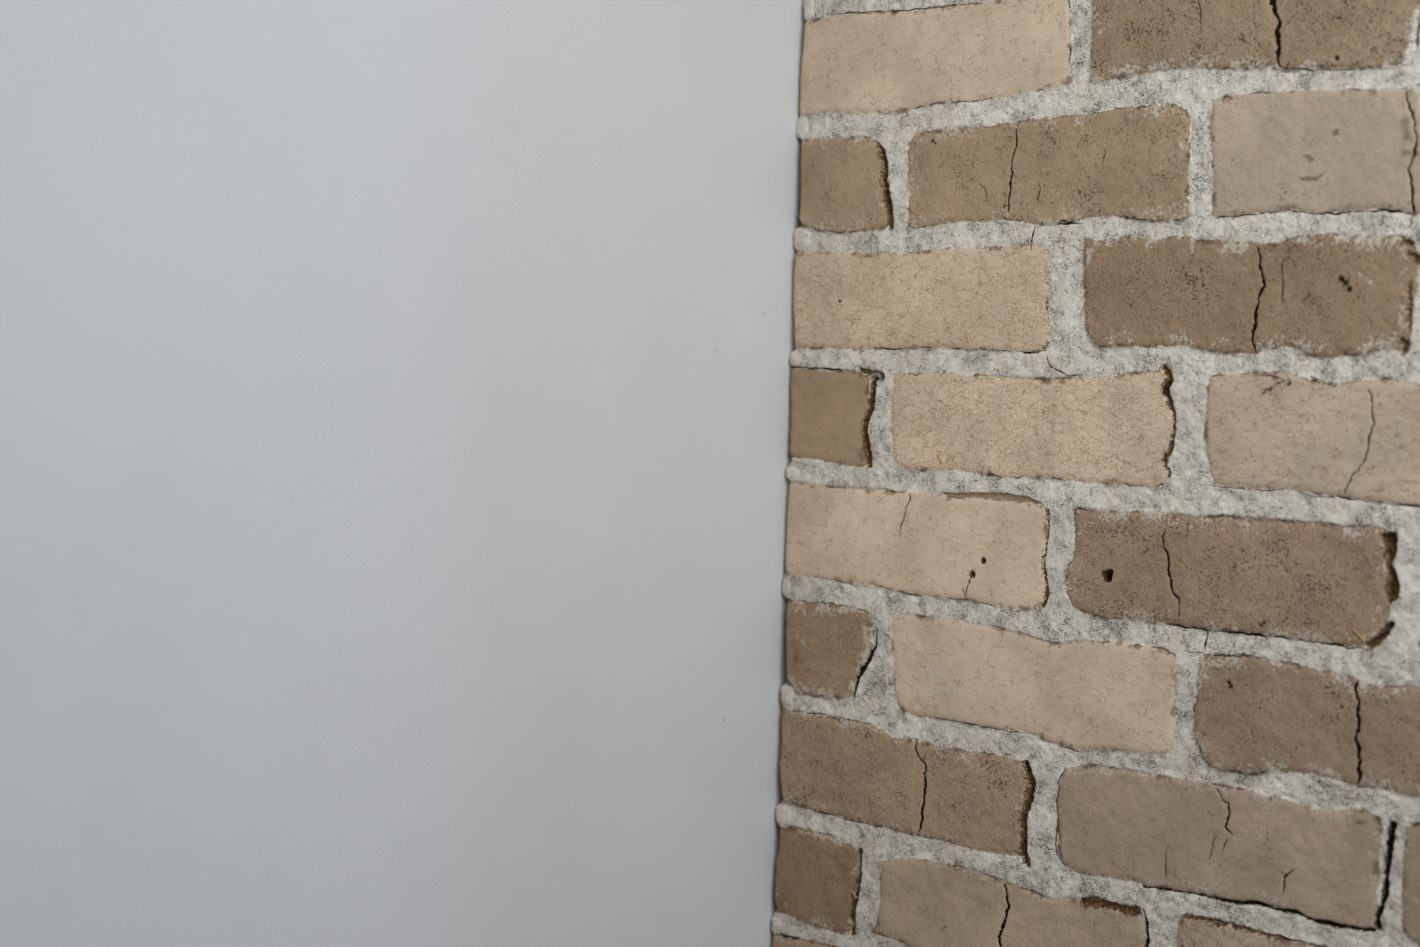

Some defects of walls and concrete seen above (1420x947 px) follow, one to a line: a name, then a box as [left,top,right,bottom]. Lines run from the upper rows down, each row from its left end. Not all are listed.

crack [980,129,1081,251]
crack [1217,0,1420,354]
crack [1200,388,1420,507]
crack [1151,518,1365,784]
crack [915,738,927,832]
crack [947,719,1080,855]
crack [998,884,1010,947]